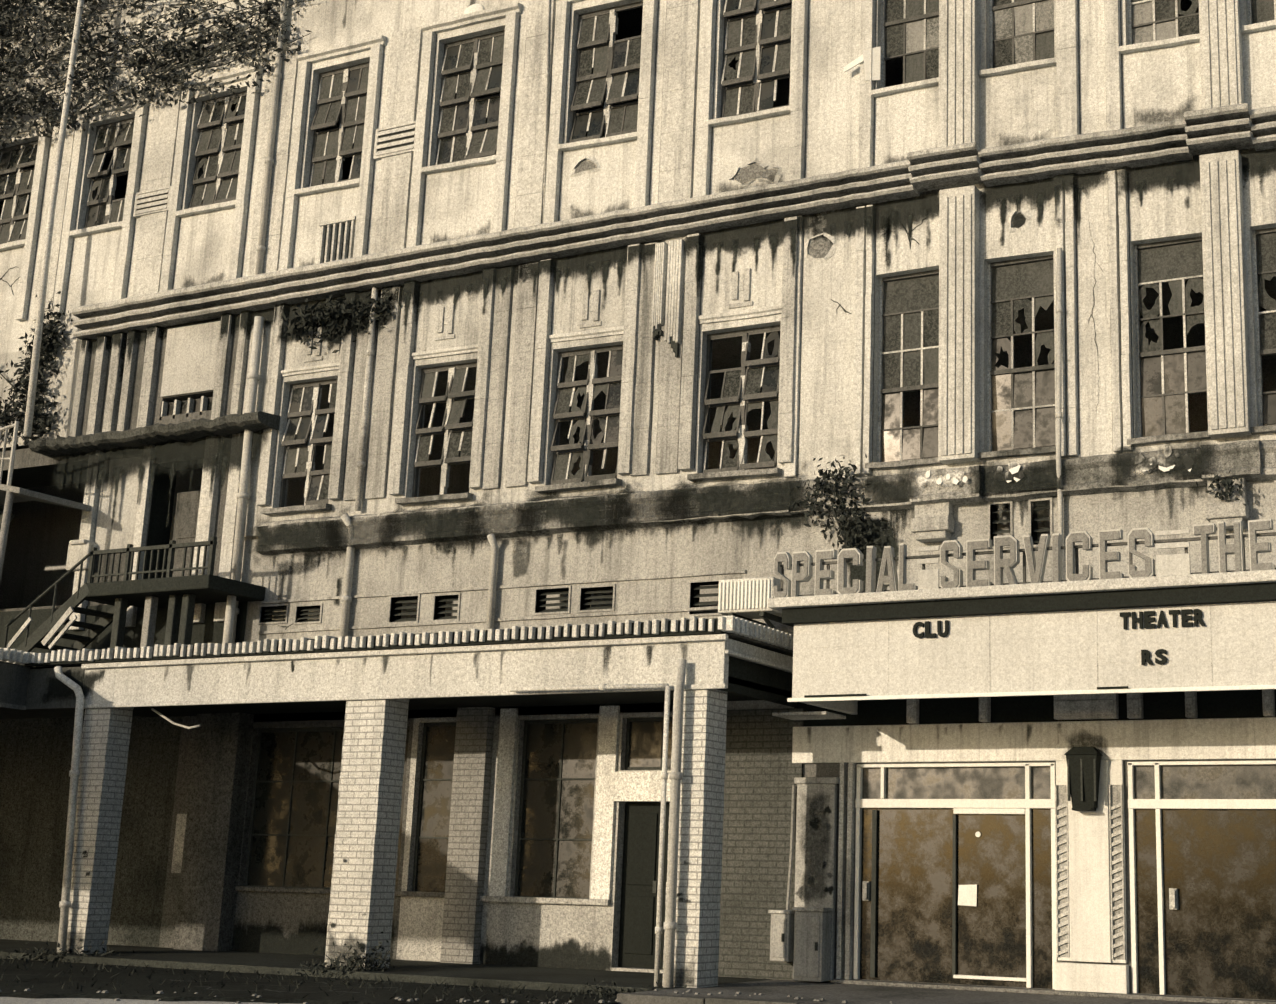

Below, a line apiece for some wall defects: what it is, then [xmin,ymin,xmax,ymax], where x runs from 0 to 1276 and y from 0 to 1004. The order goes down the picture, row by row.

flaking render [570,155,602,177]
flaking render [730,157,783,188]
leakage [1233,148,1276,188]
leakage [980,155,1200,245]
leakage [684,189,944,293]
flaking render [804,232,837,263]
crack [0,267,20,295]
leakage [1109,439,1217,518]
leakage [249,471,808,605]